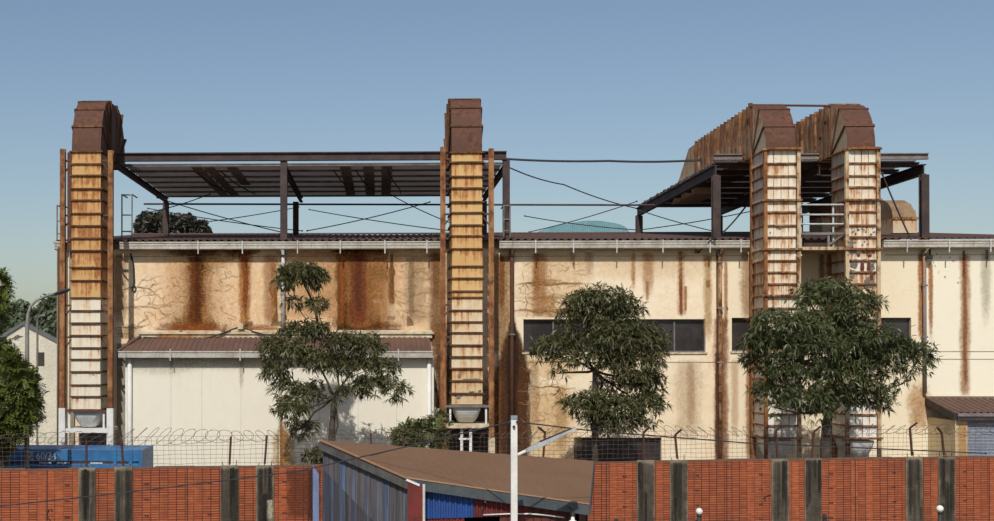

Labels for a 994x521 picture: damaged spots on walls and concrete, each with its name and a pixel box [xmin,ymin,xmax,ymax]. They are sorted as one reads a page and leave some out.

crack [116,259,240,328]
rust [158,250,227,338]
rust [238,250,277,330]
rust [333,250,395,330]
rust [534,254,554,317]
rust [679,252,687,314]
rust [961,251,970,393]